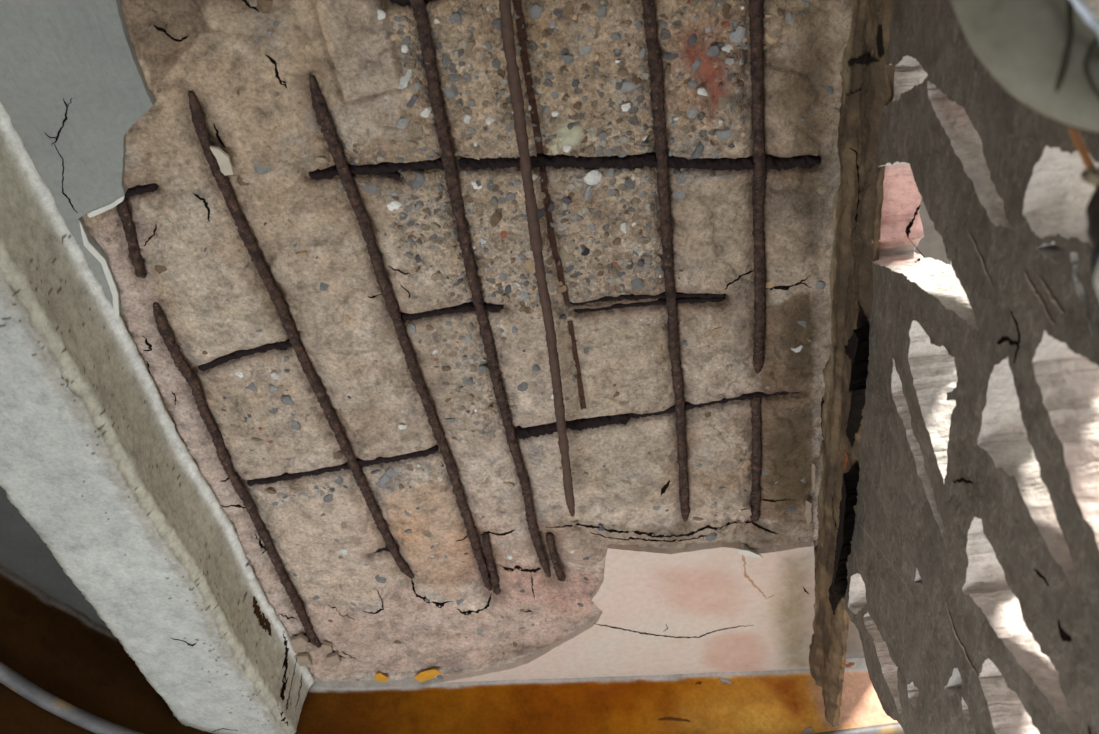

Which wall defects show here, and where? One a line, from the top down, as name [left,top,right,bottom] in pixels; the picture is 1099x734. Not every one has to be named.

corrosion [512,0,544,154]
crack [45,98,78,213]
corrosion [539,167,570,302]
spalling [79,0,861,682]
corrosion [568,321,587,410]
crack [546,499,792,542]
crack [594,623,752,638]
crack [742,555,774,599]